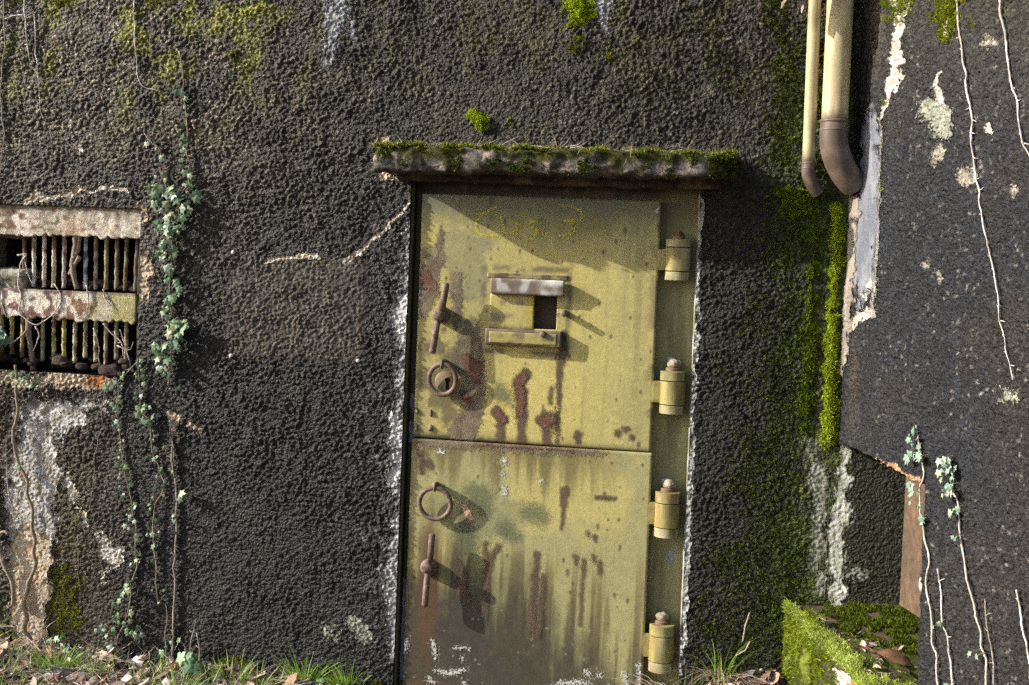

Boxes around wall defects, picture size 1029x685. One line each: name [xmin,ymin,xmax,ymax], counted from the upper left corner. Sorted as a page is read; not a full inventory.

spalling [6,235,154,302]
crack [263,201,410,264]
flaking render [839,103,883,376]
corrosion [412,228,609,475]
spalling [0,316,137,645]
peeling [376,217,415,681]
corrosion [559,486,569,530]
corrosion [451,541,501,620]
corrosion [526,551,545,639]
corrosion [572,530,601,626]
peeling [425,639,471,685]
spalling [832,667,857,685]